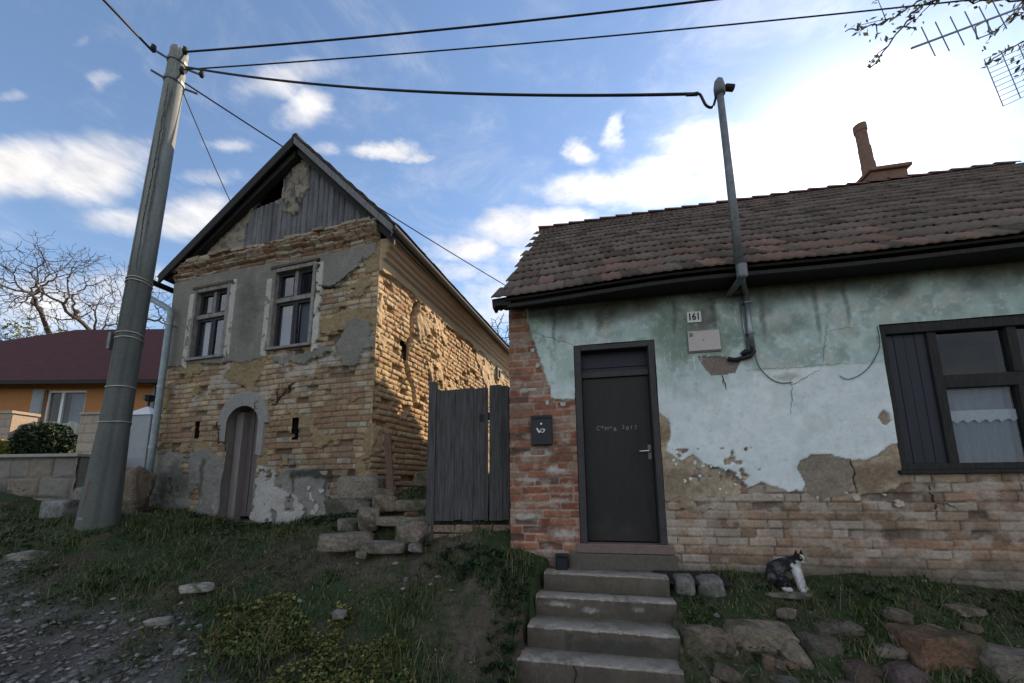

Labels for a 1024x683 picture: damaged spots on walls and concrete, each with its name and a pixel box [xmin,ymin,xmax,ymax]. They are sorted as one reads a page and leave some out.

spalling [275,159,312,215]
spalling [205,205,256,255]
spalling [699,356,742,376]
crack [721,323,864,415]
spalling [149,242,580,567]
spalling [878,411,891,426]
spalling [659,414,1024,591]